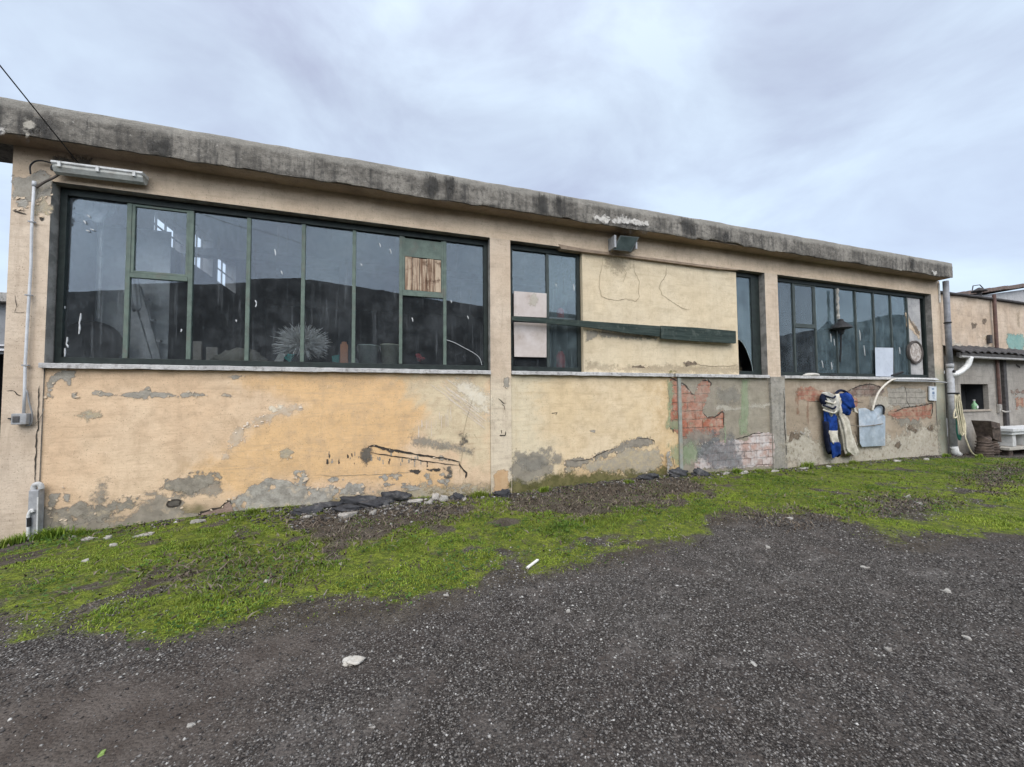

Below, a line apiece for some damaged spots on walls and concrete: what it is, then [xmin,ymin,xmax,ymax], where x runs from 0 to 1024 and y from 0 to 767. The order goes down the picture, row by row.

peeling [11,170,53,221]
damp [424,175,458,198]
damp [536,194,565,215]
damp [682,217,696,234]
crack [599,263,689,310]
peeling [43,369,79,399]
peeling [92,386,208,399]
flaking render [564,377,941,476]
spalling [166,499,181,508]